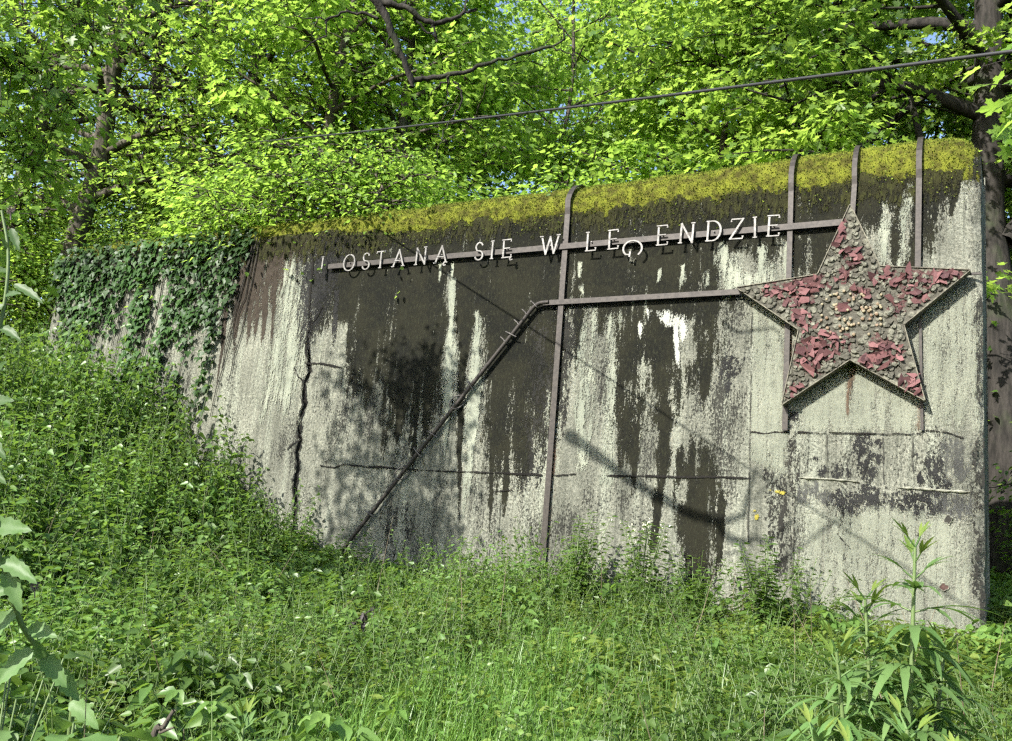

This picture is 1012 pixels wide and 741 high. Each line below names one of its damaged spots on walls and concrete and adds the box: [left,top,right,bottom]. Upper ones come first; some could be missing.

damp [702,235,805,298]
damp [875,182,915,267]
damp [948,179,961,223]
damp [217,232,346,424]
crack [287,235,576,542]
damp [393,260,641,532]
damp [638,308,689,364]
damp [699,352,745,410]
damp [649,392,685,557]
damp [685,489,727,600]
damp [760,433,801,581]